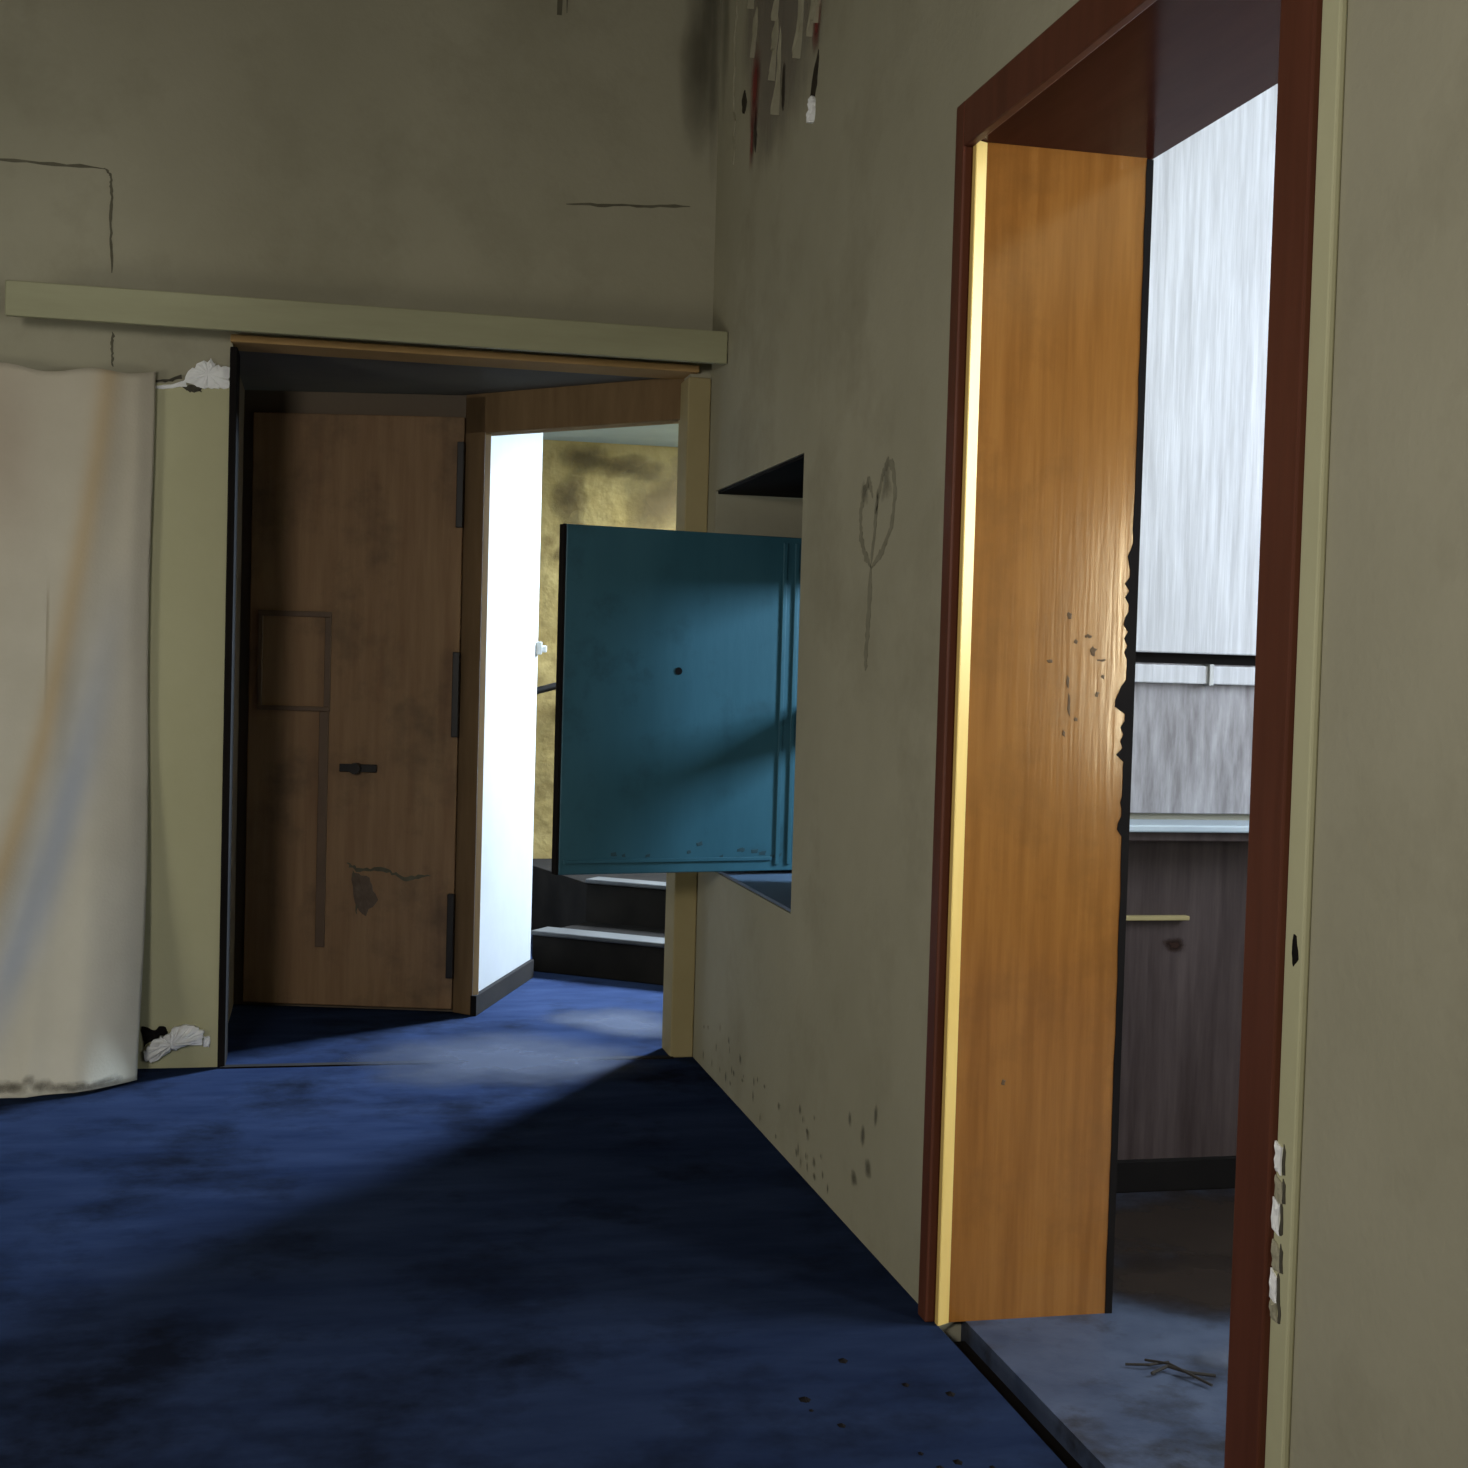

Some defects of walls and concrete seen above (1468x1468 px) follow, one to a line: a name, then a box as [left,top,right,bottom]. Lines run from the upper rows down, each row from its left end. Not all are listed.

crack [557,0,568,15]